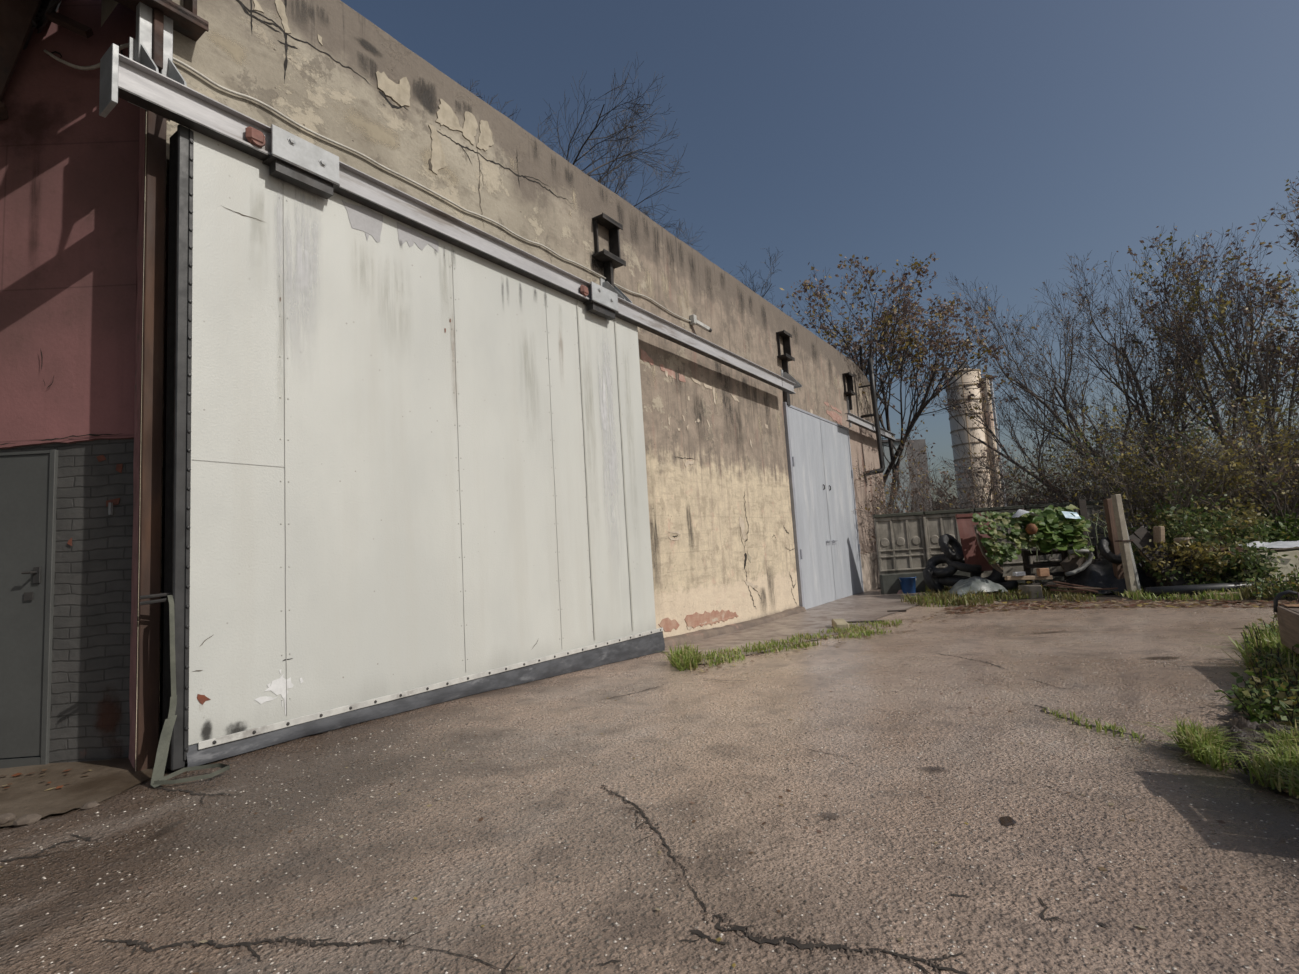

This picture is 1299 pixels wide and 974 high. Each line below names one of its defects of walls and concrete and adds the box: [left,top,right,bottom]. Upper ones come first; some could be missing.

crack [237,0,371,85]
spalling [375,71,410,111]
spalling [428,99,494,174]
crack [430,123,572,225]
crack [740,492,797,607]
spalling [658,610,738,632]